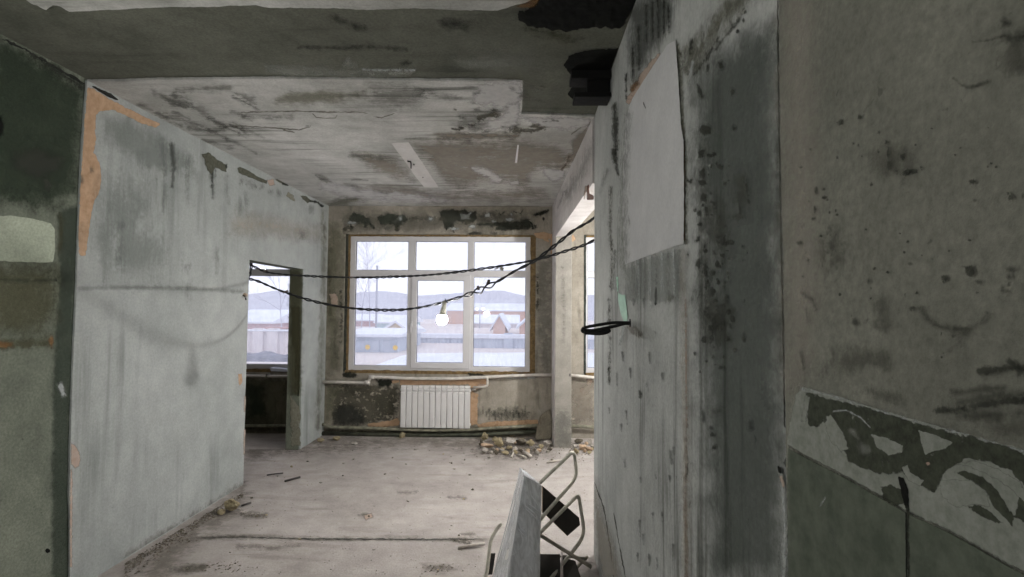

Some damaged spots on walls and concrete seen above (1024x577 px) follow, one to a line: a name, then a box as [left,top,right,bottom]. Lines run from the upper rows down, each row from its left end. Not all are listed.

spalling [518,0,636,39]
flaking render [78,88,160,256]
spalling [202,153,324,207]
leakage [633,0,780,573]
peeling [787,387,1024,571]